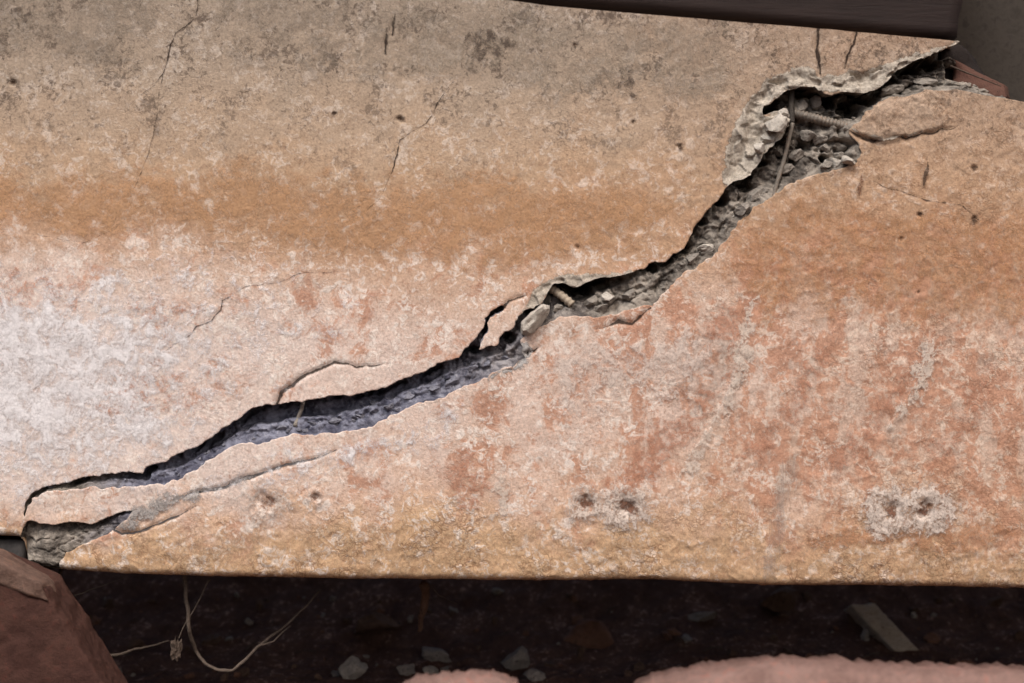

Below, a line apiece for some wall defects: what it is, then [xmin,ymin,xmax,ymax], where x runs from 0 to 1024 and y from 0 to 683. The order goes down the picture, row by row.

spalling [722,41,959,196]
damp [0,269,229,495]
crack [27,28,1006,535]
damp [858,481,963,541]